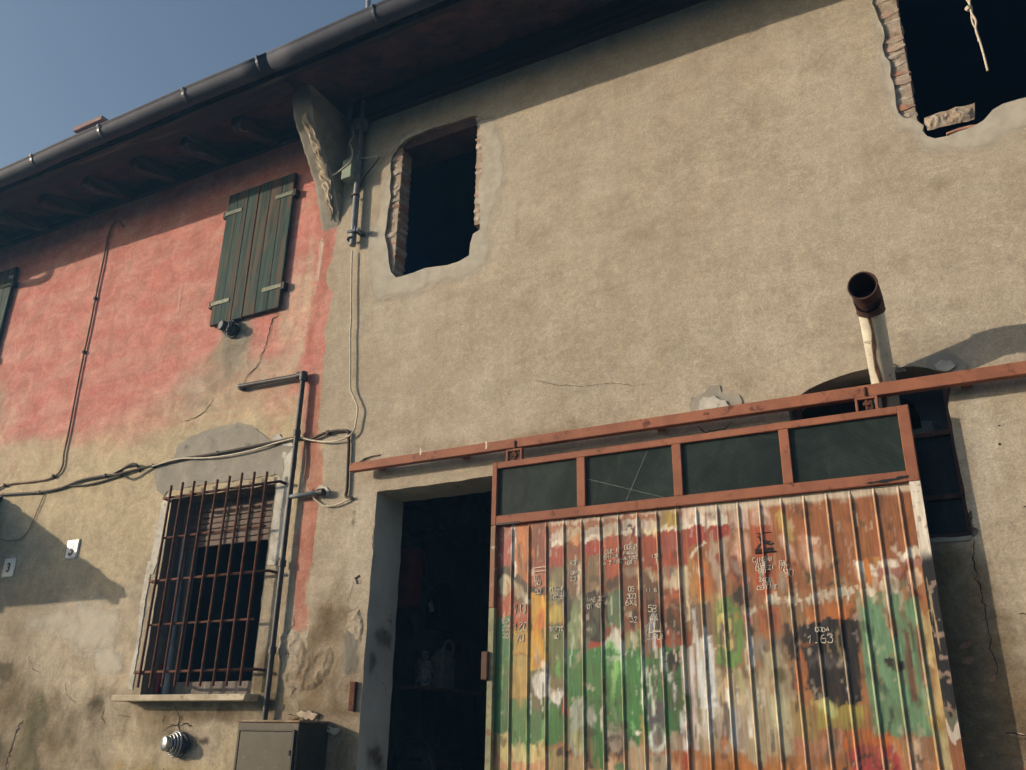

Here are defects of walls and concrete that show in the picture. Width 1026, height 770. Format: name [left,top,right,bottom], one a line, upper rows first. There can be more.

crack [244,312,278,383]
damp [29,603,121,676]
crack [972,543,998,681]
crack [5,719,24,770]